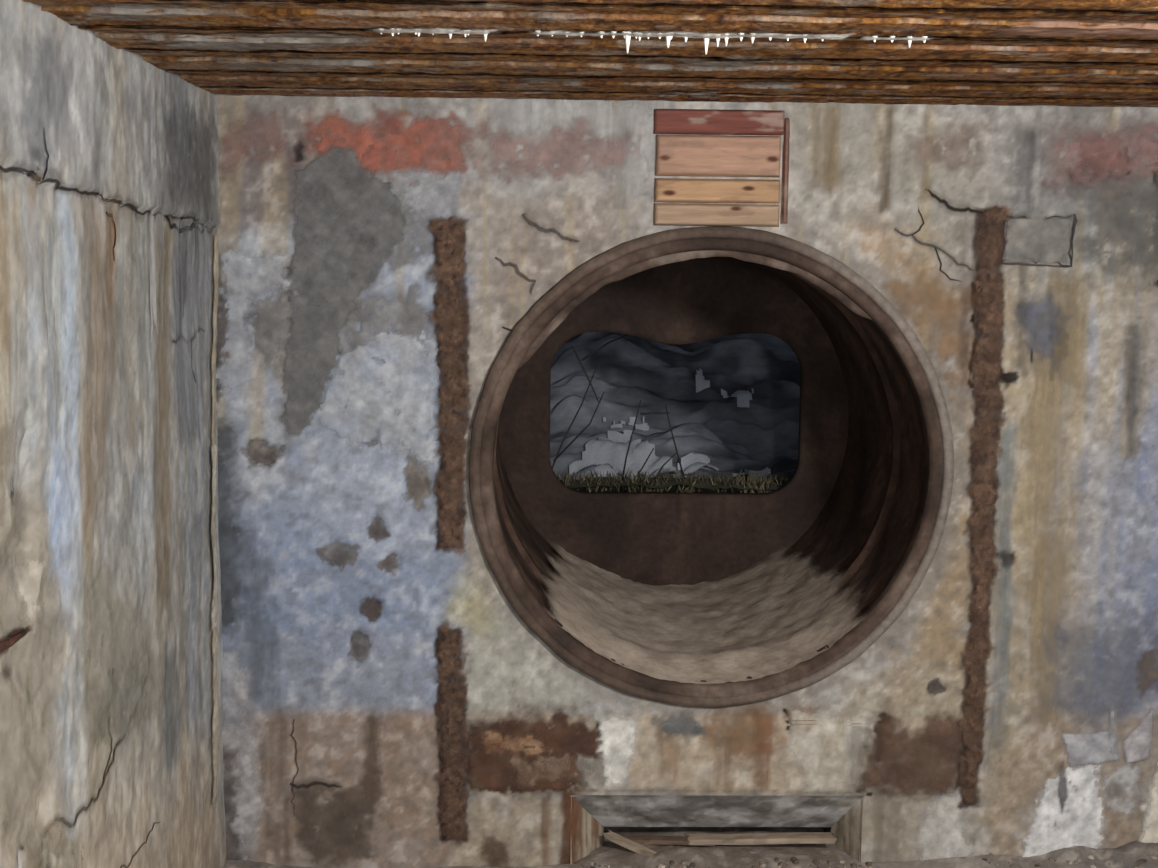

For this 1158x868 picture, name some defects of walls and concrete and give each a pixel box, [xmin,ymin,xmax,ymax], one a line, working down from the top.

crack [0,131,216,258]
peeling [480,123,627,177]
crack [895,188,1077,281]
peeling [216,111,478,511]
corrosion [465,713,604,867]
corrosion [863,716,965,795]